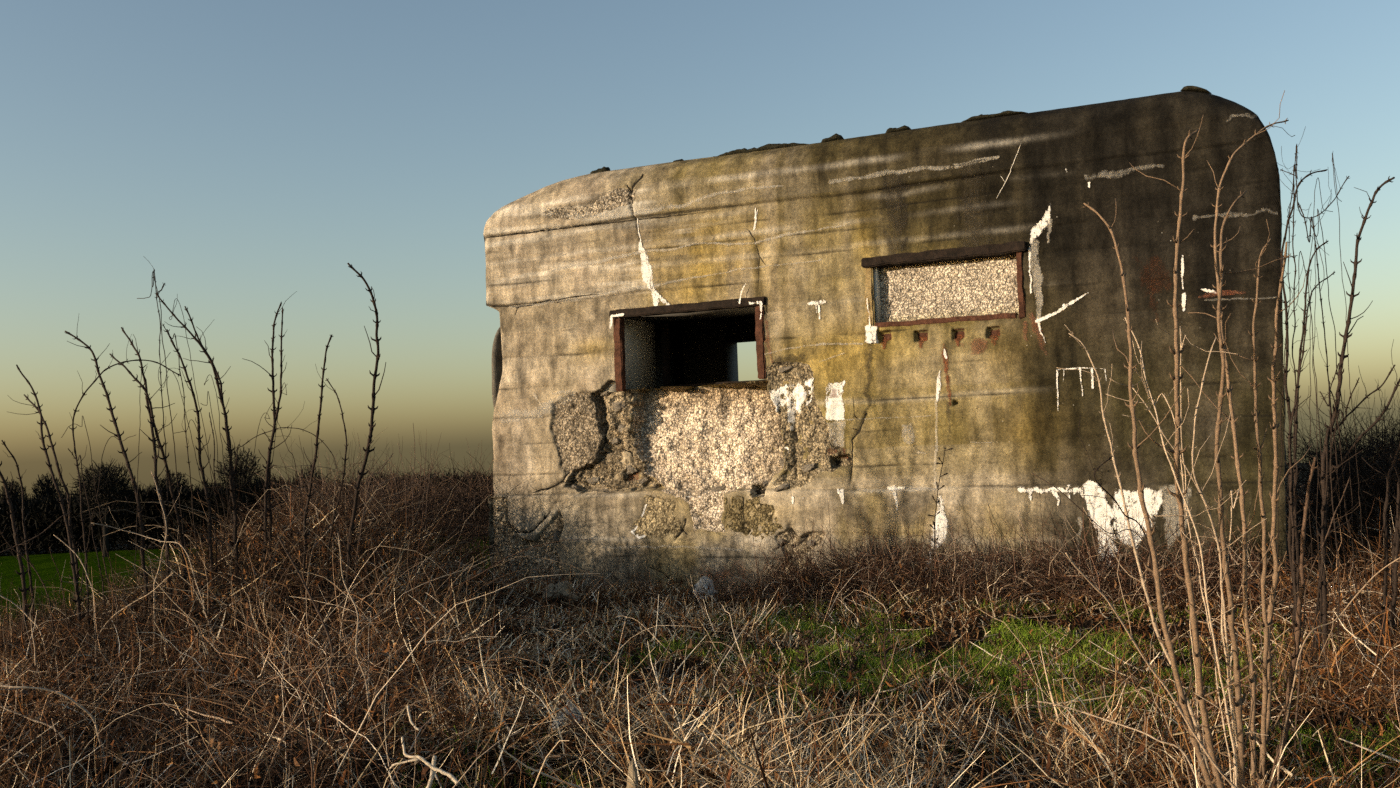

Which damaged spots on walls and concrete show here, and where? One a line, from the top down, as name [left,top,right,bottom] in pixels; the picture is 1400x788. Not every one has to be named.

leakage [637,218,670,306]
leakage [1028,206,1050,293]
leakage [1181,255,1217,311]
leakage [865,298,878,343]
leakage [1035,292,1089,343]
leakage [770,378,814,430]
leakage [1056,367,1106,410]
spalling [550,361,852,584]
leakage [887,485,905,510]
leakage [925,496,949,583]
leakage [1017,480,1163,578]